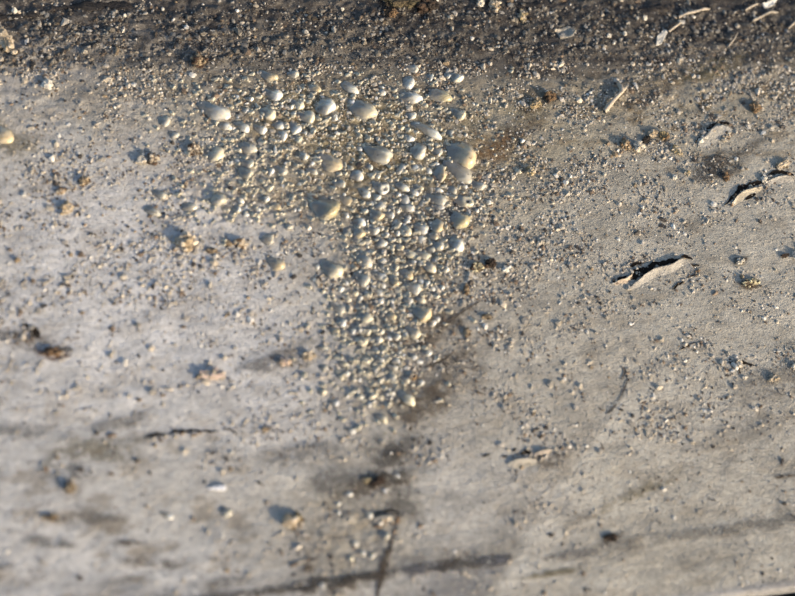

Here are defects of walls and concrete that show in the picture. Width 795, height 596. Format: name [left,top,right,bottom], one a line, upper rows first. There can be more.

crack [724,167,795,207]
water stain [414,314,462,346]
water stain [397,386,449,422]